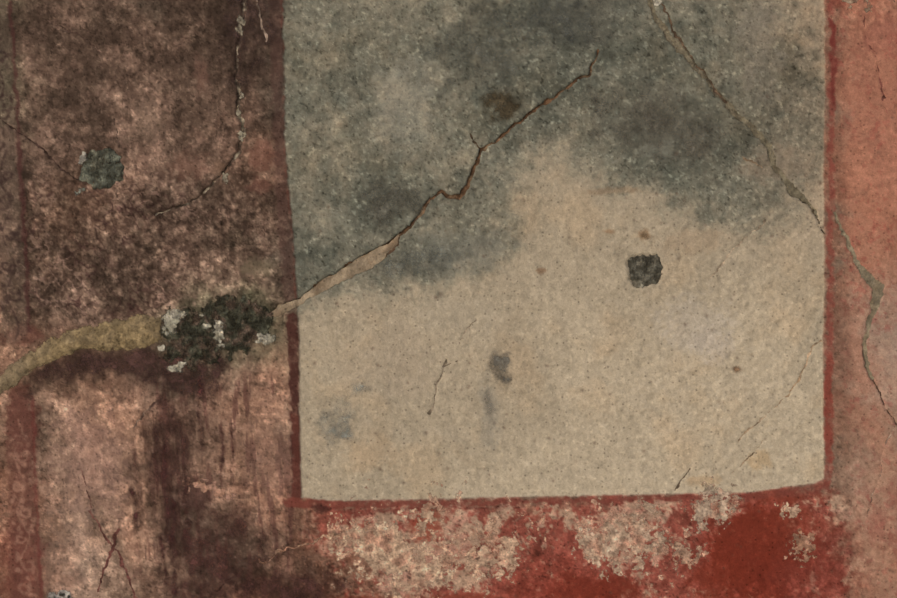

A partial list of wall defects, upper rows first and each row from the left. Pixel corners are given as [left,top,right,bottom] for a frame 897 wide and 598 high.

crack [0,118,79,180]
crack [155,0,268,216]
crack [272,49,599,317]
crack [648,0,897,473]
crack [427,320,477,415]
peeling [258,482,546,598]
peeling [571,476,742,588]
peeling [774,502,817,568]